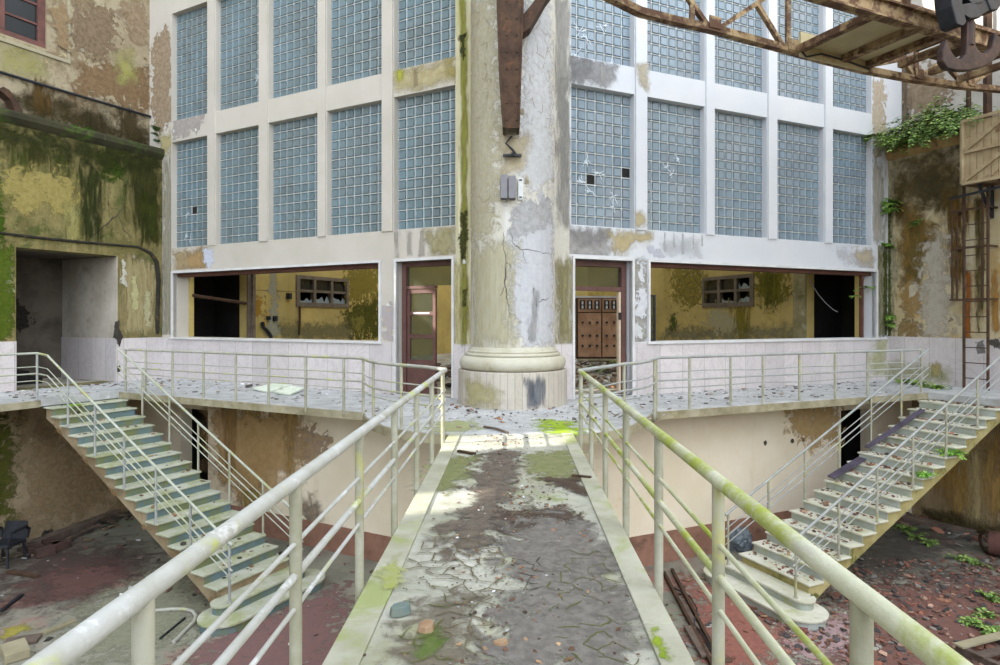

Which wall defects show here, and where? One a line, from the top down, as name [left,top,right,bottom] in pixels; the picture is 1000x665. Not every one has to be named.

peeling [49,0,205,140]
peeling [638,64,649,89]
leakage [8,147,70,182]
leakage [65,205,83,240]
peeling [202,246,215,268]
crack [472,181,551,314]
leakage [394,0,653,348]
peeling [635,246,665,342]
peeling [908,223,961,338]
leakage [524,378,546,408]
leakage [11,425,112,529]
crack [398,495,639,665]